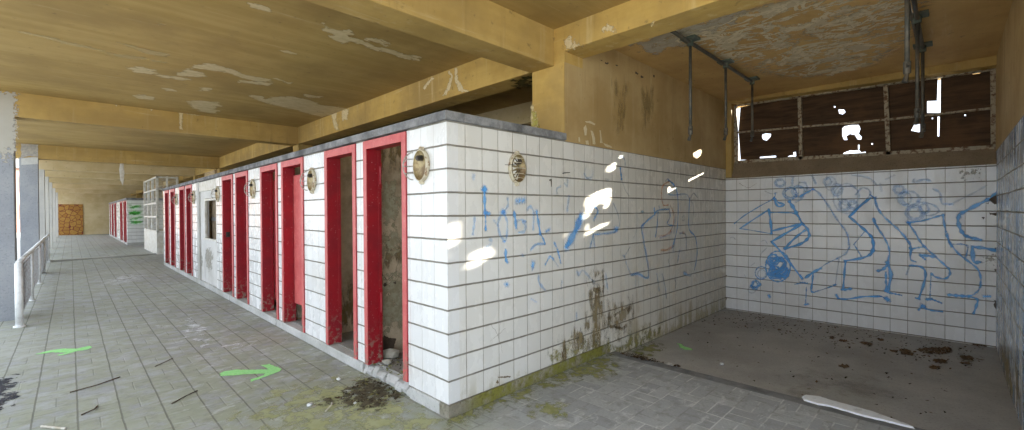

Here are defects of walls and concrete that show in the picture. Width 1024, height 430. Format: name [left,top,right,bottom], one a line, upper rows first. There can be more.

peeling [322,23,422,61]
peeling [659,0,921,77]
peeling [128,63,346,117]
peeling [0,91,20,163]
leakage [562,274,634,361]